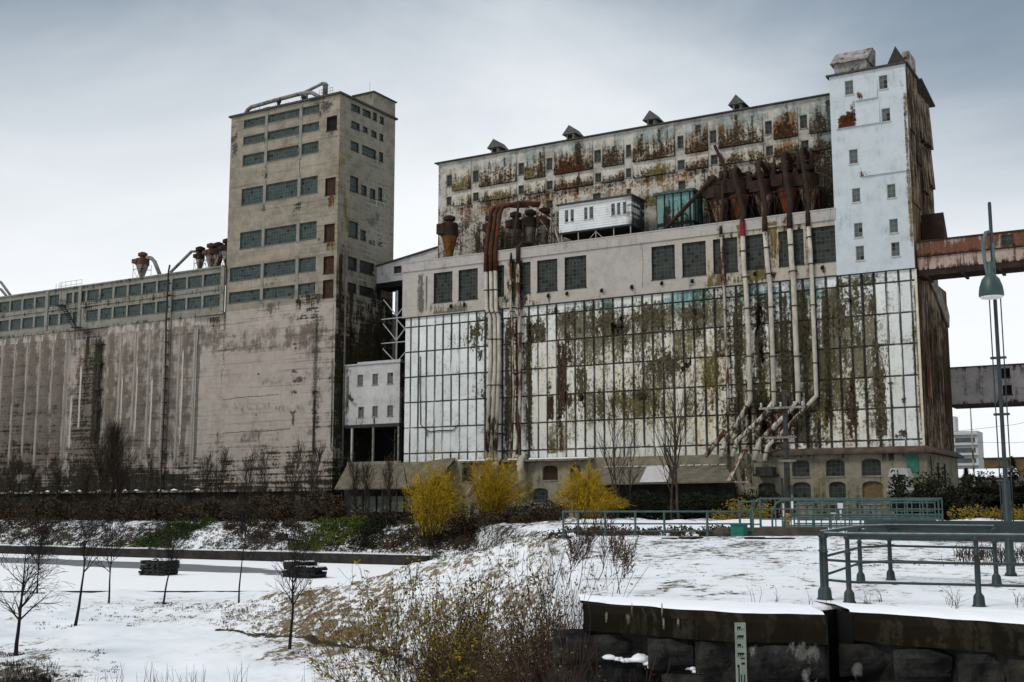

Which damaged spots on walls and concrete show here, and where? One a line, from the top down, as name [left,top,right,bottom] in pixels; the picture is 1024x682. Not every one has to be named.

corrosion [555,158,583,174]
corrosion [838,92,862,128]
water stain [0,315,226,468]
water stain [296,297,318,482]
water stain [330,251,386,449]
water stain [505,316,532,448]